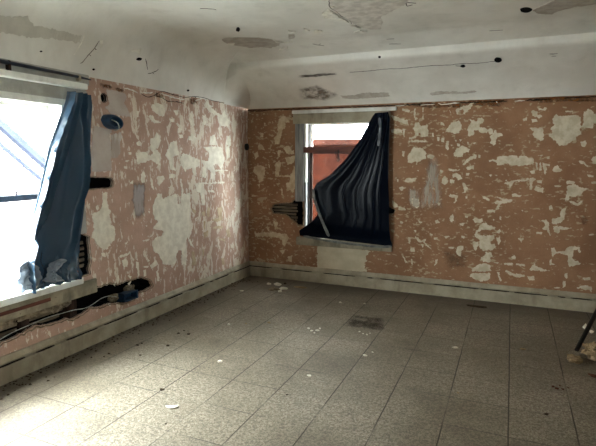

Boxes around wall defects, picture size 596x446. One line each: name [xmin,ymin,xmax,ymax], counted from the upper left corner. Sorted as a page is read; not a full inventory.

peeling [520,0,596,15]
peeling [0,15,82,44]
peeling [222,37,280,48]
flaking render [101,88,153,117]
peeling [523,107,596,147]
peeling [253,115,295,195]
peeling [391,102,503,203]
peeling [555,174,596,206]
flaking render [0,98,231,347]
flaking render [270,199,304,226]
peeling [460,155,581,282]
water stain [349,316,382,329]